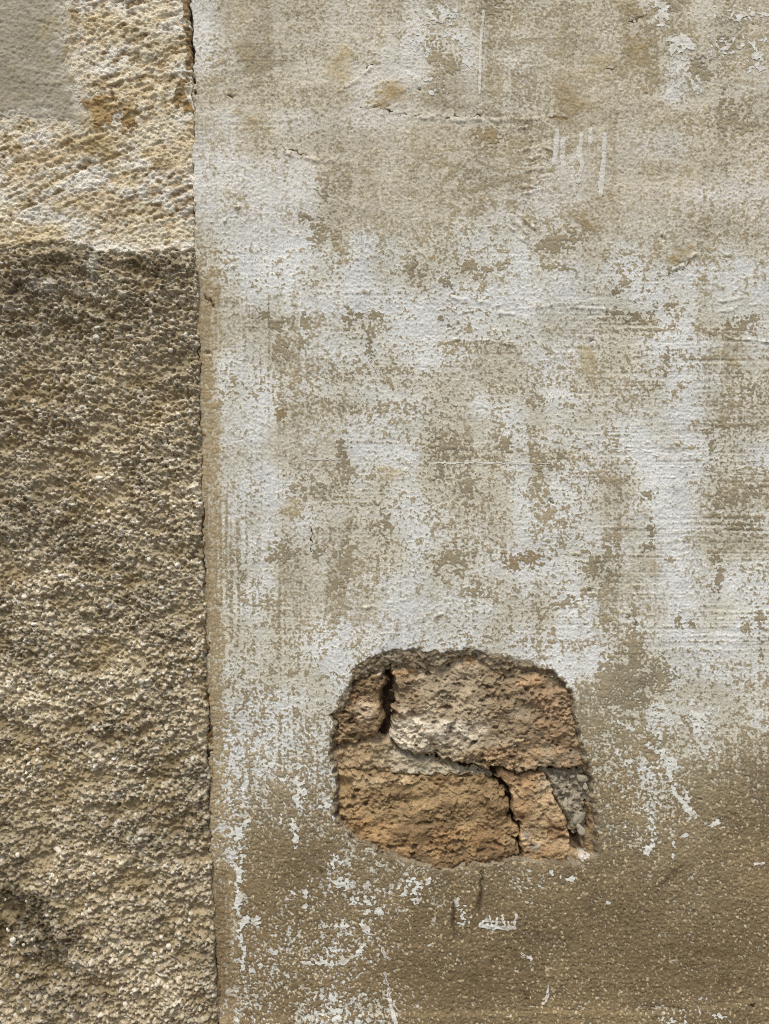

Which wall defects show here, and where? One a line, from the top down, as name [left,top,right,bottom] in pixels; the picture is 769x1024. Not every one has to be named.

crack [378,667,395,734]
spalling [245,647,599,968]
crack [424,754,521,852]